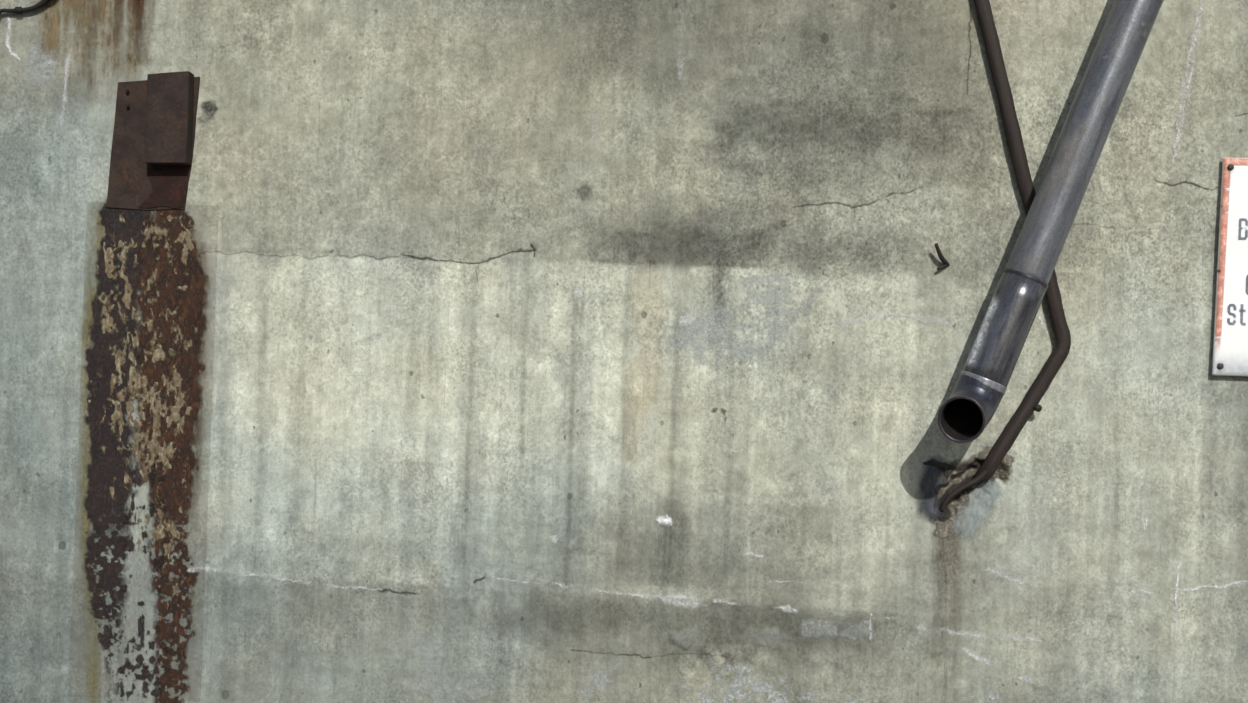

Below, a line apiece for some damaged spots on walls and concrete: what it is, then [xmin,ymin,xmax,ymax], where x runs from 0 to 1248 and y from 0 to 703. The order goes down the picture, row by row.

rust [42,0,144,68]
crack [405,245,535,264]
rust [82,167,208,703]